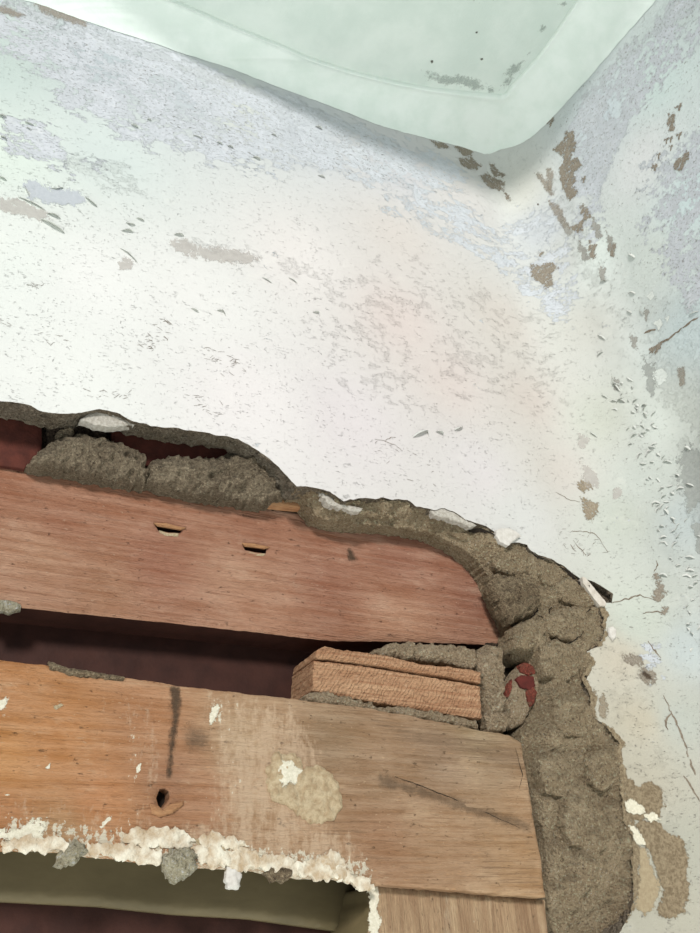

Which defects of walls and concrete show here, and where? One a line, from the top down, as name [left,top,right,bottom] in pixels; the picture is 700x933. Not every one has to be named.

flaking render [431,140,511,200]
flaking render [536,130,616,282]
flaking render [530,252,559,290]
crack [644,318,697,354]
peeling [603,335,658,445]
flaking render [78,412,134,432]
flaking render [558,460,600,523]
peeling [636,442,700,587]
flaking render [285,489,691,933]